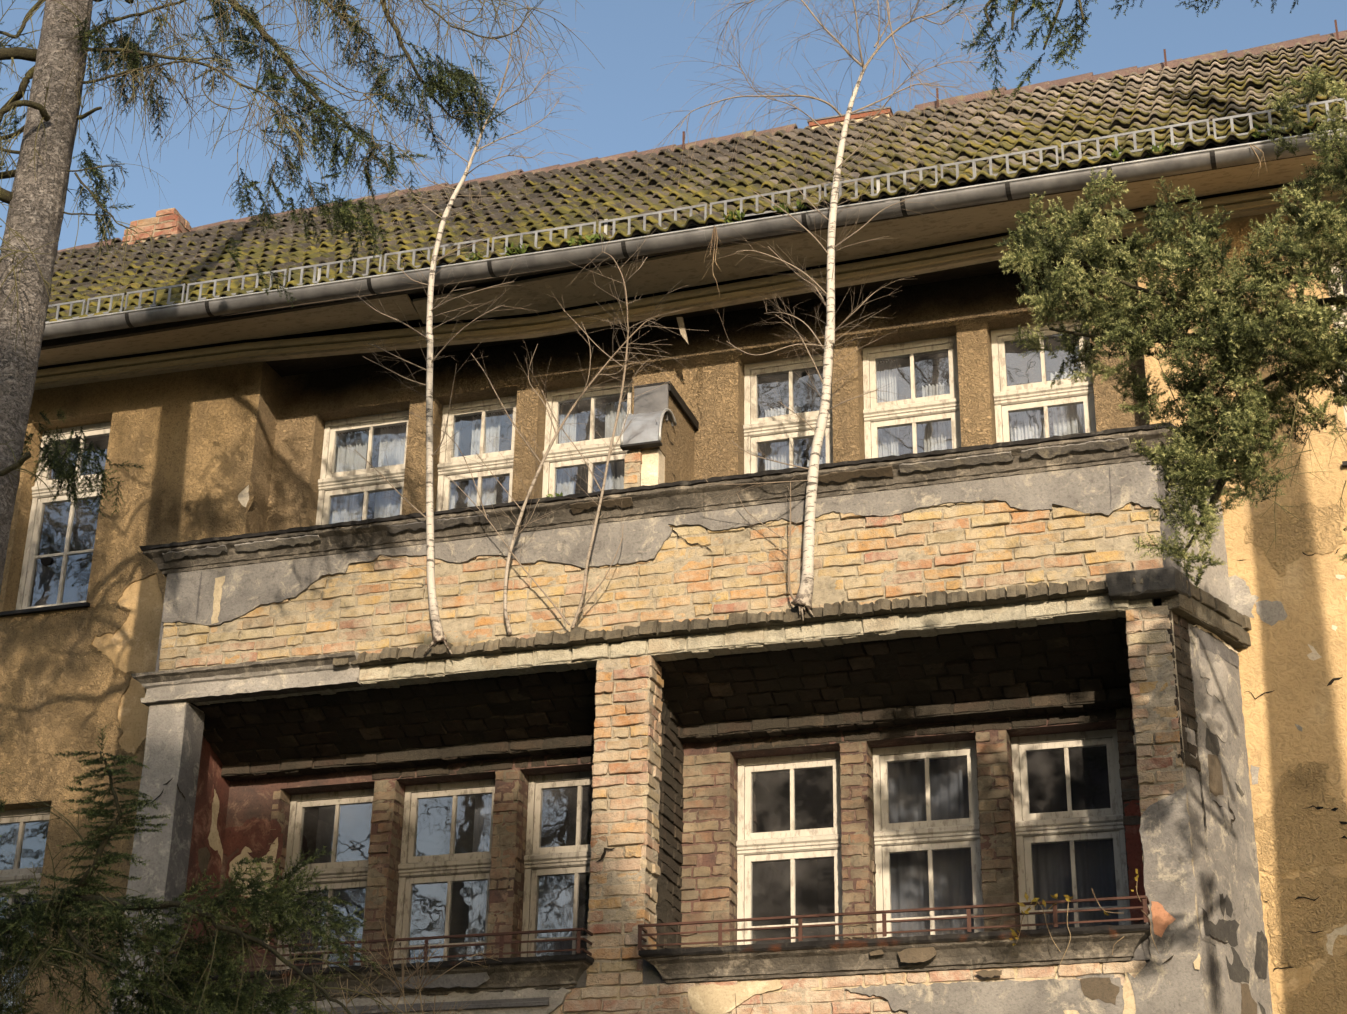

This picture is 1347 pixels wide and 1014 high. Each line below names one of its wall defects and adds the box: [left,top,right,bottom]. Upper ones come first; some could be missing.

flaking render [235,482,254,511]
spalling [89,500,1164,757]
peeling [206,784,283,954]
flaking render [1147,901,1175,937]
peeling [1193,760,1347,1014]
peeling [393,972,490,996]
spalling [551,947,1147,1014]